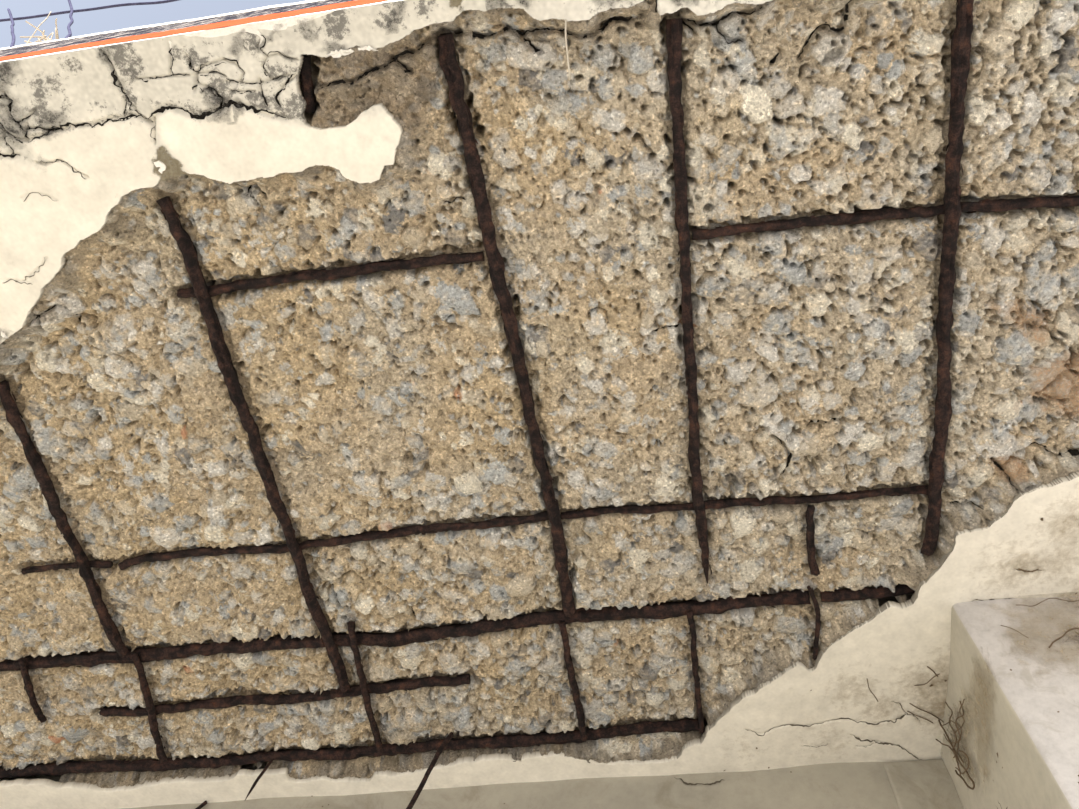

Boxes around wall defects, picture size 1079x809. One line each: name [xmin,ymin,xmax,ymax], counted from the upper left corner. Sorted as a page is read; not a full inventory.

water stain [0,64,61,143]
crack [0,35,294,179]
crack [317,0,657,91]
crack [683,7,762,44]
spalling [437,32,576,617]
spalling [665,18,712,584]
spalling [692,204,945,240]
spalling [920,0,1079,556]
corrosion [1032,350,1079,416]
spalling [0,196,579,788]
spalling [355,589,816,767]
crack [747,702,920,759]